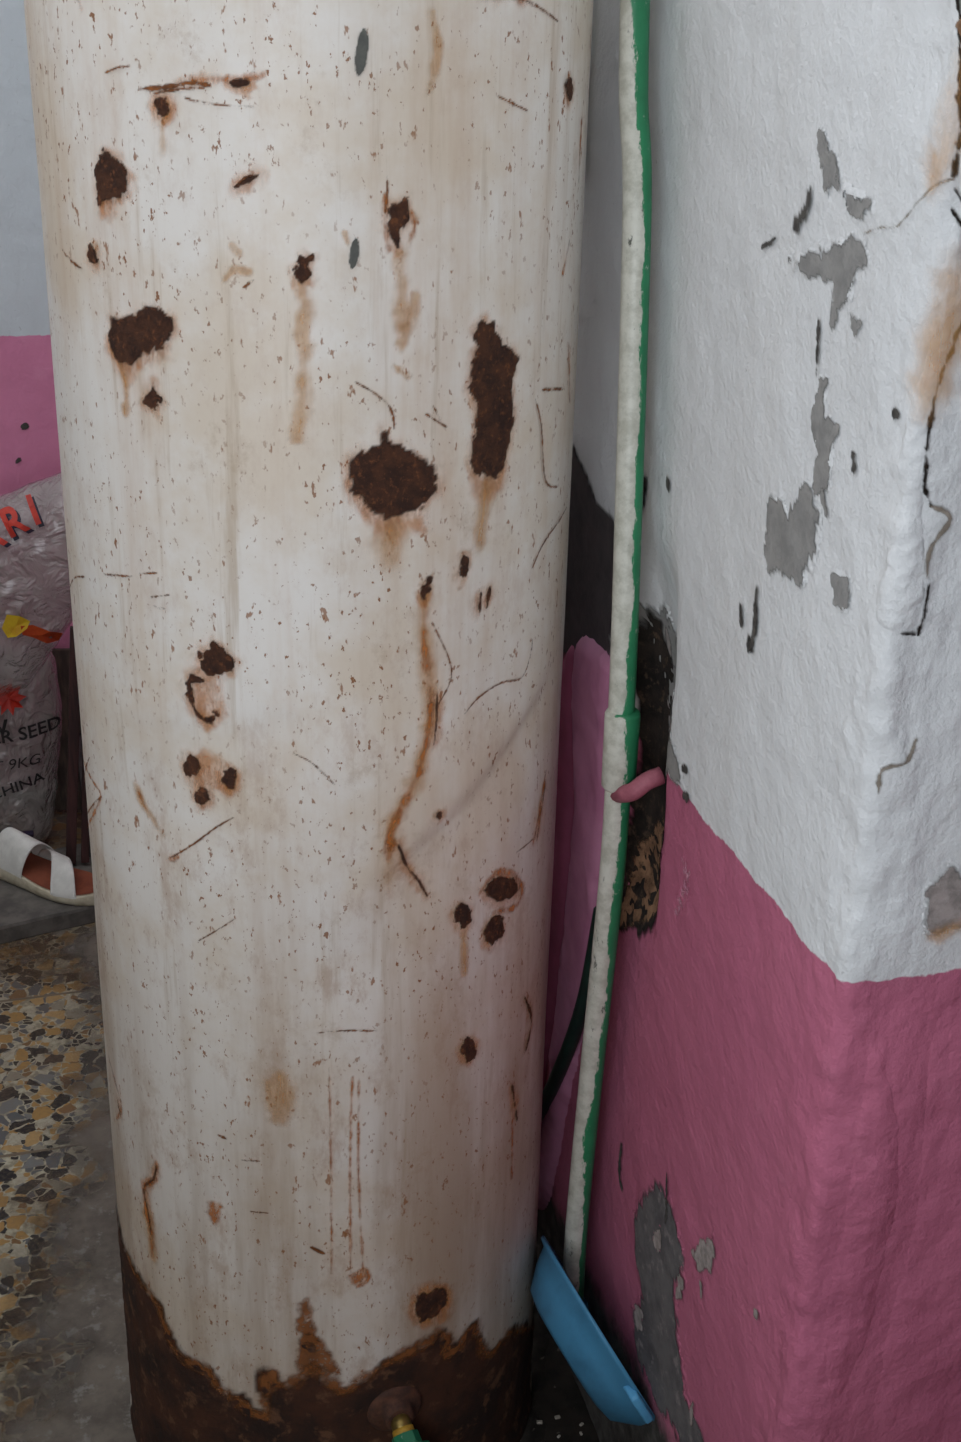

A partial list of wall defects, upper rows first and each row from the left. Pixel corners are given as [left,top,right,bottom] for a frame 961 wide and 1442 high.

crack [866,0,961,234]
peeling [739,587,758,653]
peeling [764,126,876,614]
crack [876,739,917,793]
crack [902,317,961,636]
peeling [618,1143,715,1442]